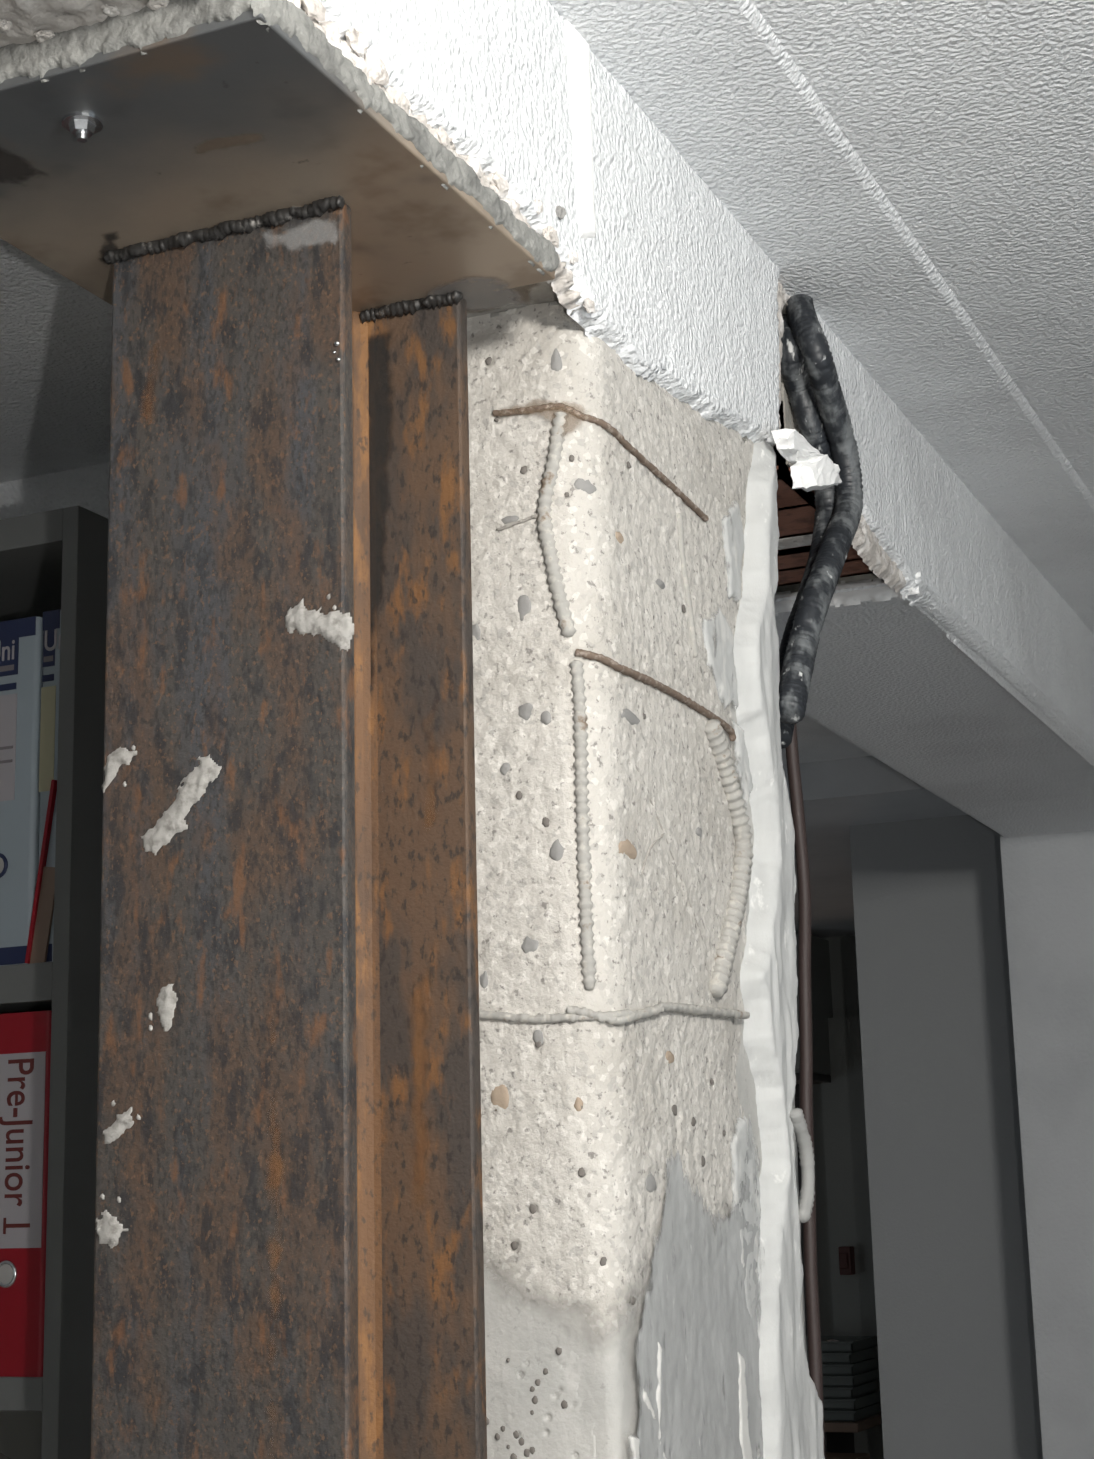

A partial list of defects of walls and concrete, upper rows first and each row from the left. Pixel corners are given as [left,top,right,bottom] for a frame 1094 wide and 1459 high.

spalling [0,0,169,47]
spalling [830,514,921,607]
spalling [287,0,825,1459]